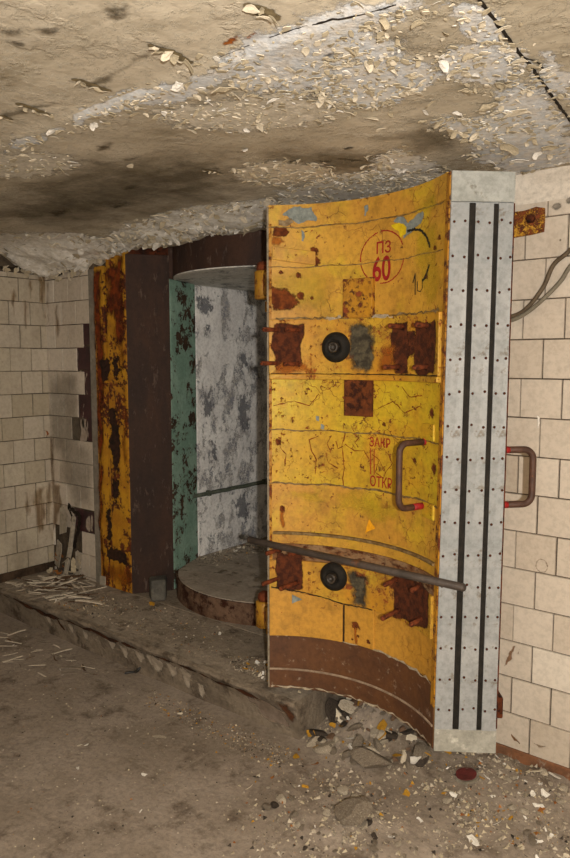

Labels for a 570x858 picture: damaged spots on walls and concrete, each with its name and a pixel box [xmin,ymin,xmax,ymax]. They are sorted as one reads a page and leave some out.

crack [269,4,396,38]
crack [477,0,570,122]
peeling [0,0,570,179]
damp [33,164,209,218]
peeling [0,146,451,282]
corrosion [272,286,313,311]
corrosion [271,323,311,374]
corrosion [379,320,436,376]
peeling [77,323,121,442]
corrosion [93,256,124,576]
peeling [74,507,94,534]
corrosion [391,577,429,629]